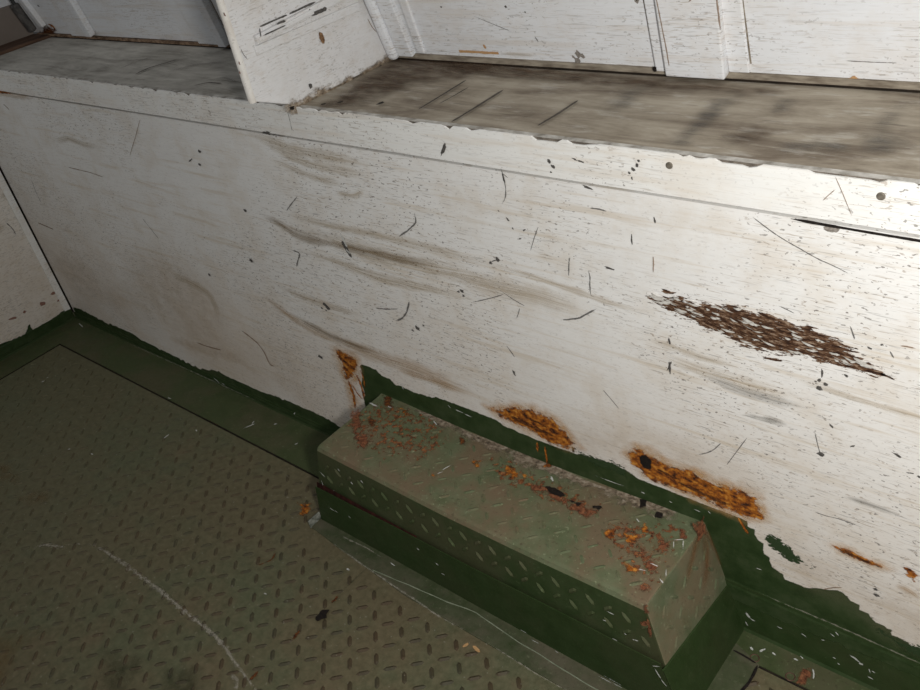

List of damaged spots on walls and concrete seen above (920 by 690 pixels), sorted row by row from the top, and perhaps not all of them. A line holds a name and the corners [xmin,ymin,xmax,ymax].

corrosion [336,350,706,590]
corrosion [628,446,765,533]